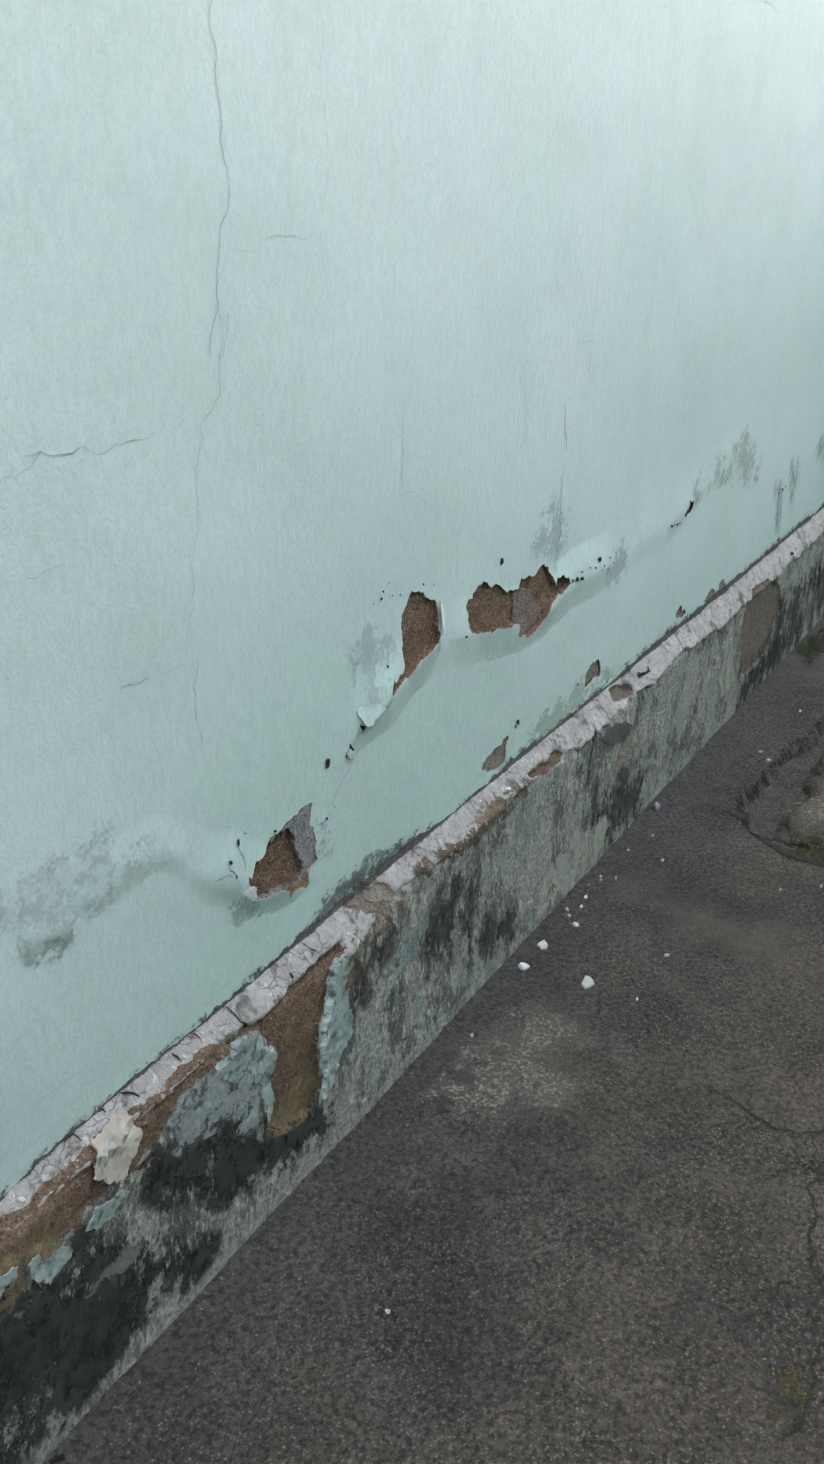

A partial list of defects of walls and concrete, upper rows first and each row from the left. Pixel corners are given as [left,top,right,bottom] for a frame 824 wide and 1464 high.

crack [0,1,329,749]
flaking render [345,591,445,759]
flaking render [482,719,520,772]
flaking render [466,564,571,638]
flaking render [243,803,318,901]
flaking render [0,944,354,1300]